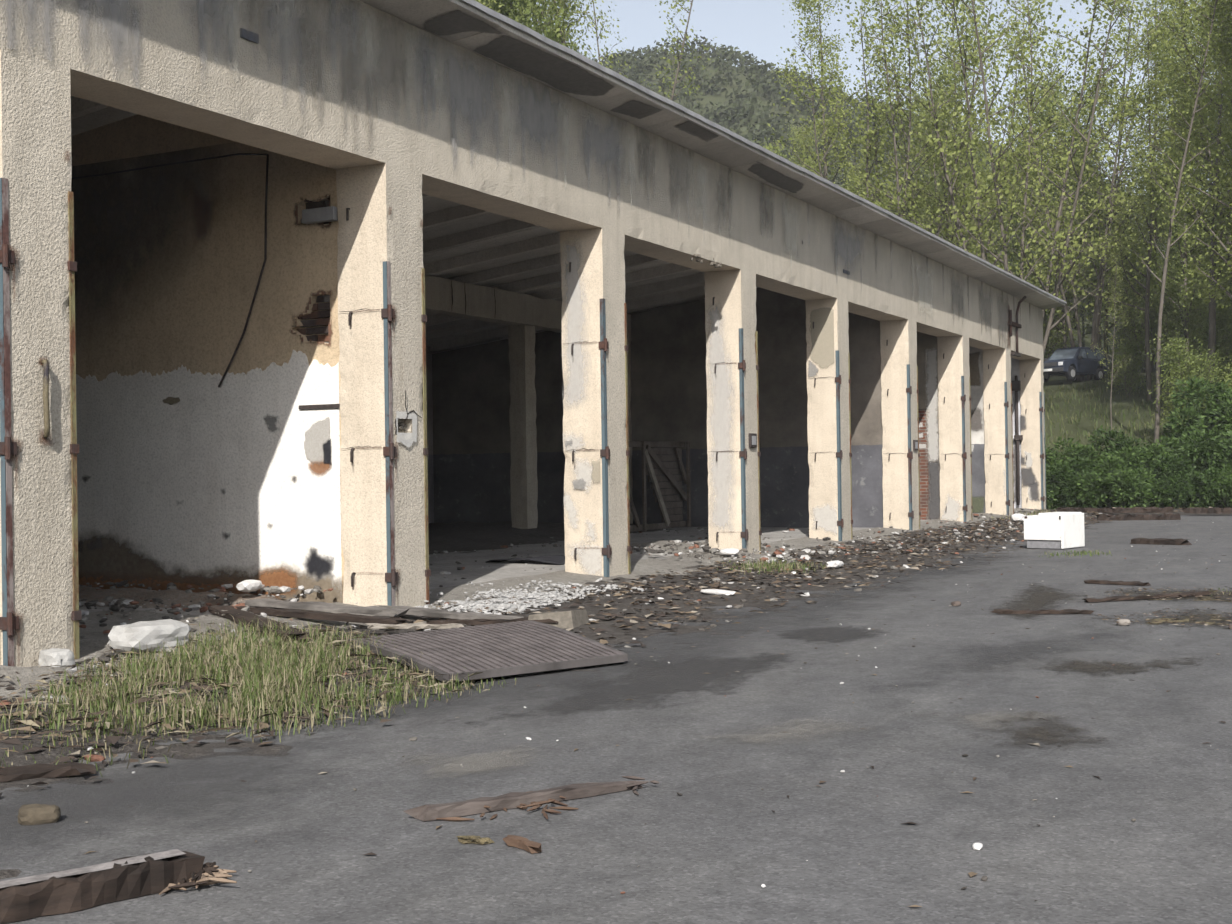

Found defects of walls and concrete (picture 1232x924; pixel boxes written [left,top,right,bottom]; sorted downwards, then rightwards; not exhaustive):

damp [424,11,614,152]
damp [584,100,661,176]
damp [676,121,719,141]
spalling [293,194,332,229]
damp [748,162,803,222]
damp [952,280,1008,348]
peeling [76,290,342,583]
damp [305,549,333,579]